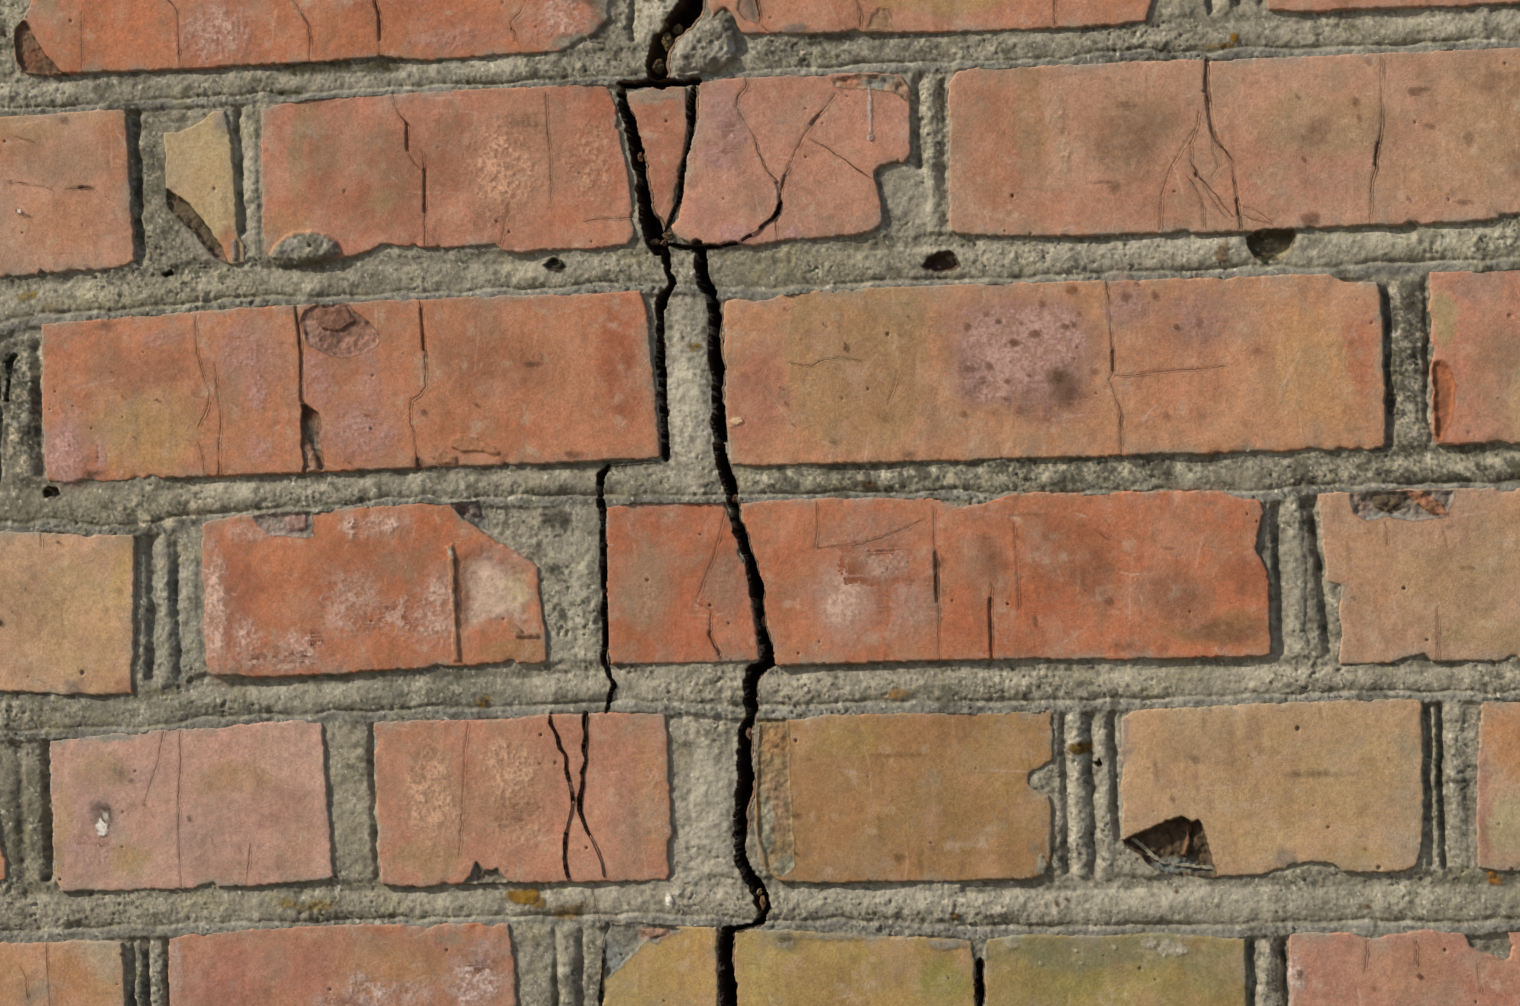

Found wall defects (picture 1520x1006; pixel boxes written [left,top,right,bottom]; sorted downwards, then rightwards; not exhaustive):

spalling [14,21,68,76]
spalling [166,188,237,264]
spalling [300,401,325,473]
crack [545,0,868,1006]
spalling [1121,816,1217,876]